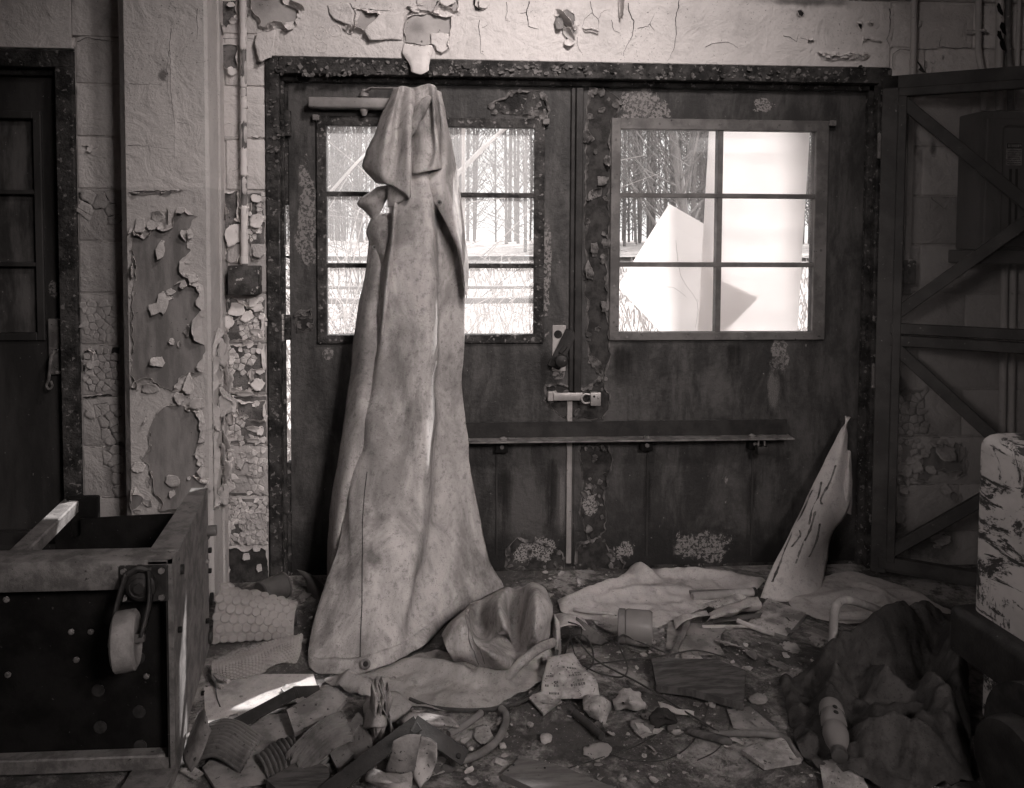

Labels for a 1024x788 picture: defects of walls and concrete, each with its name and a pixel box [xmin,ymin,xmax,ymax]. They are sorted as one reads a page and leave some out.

crack [478,1,540,56]
peeling [554,8,600,46]
crack [577,0,741,60]
peeling [220,0,589,170]
corrosion [487,88,551,119]
corrosion [543,87,629,421]
peeling [127,176,269,583]